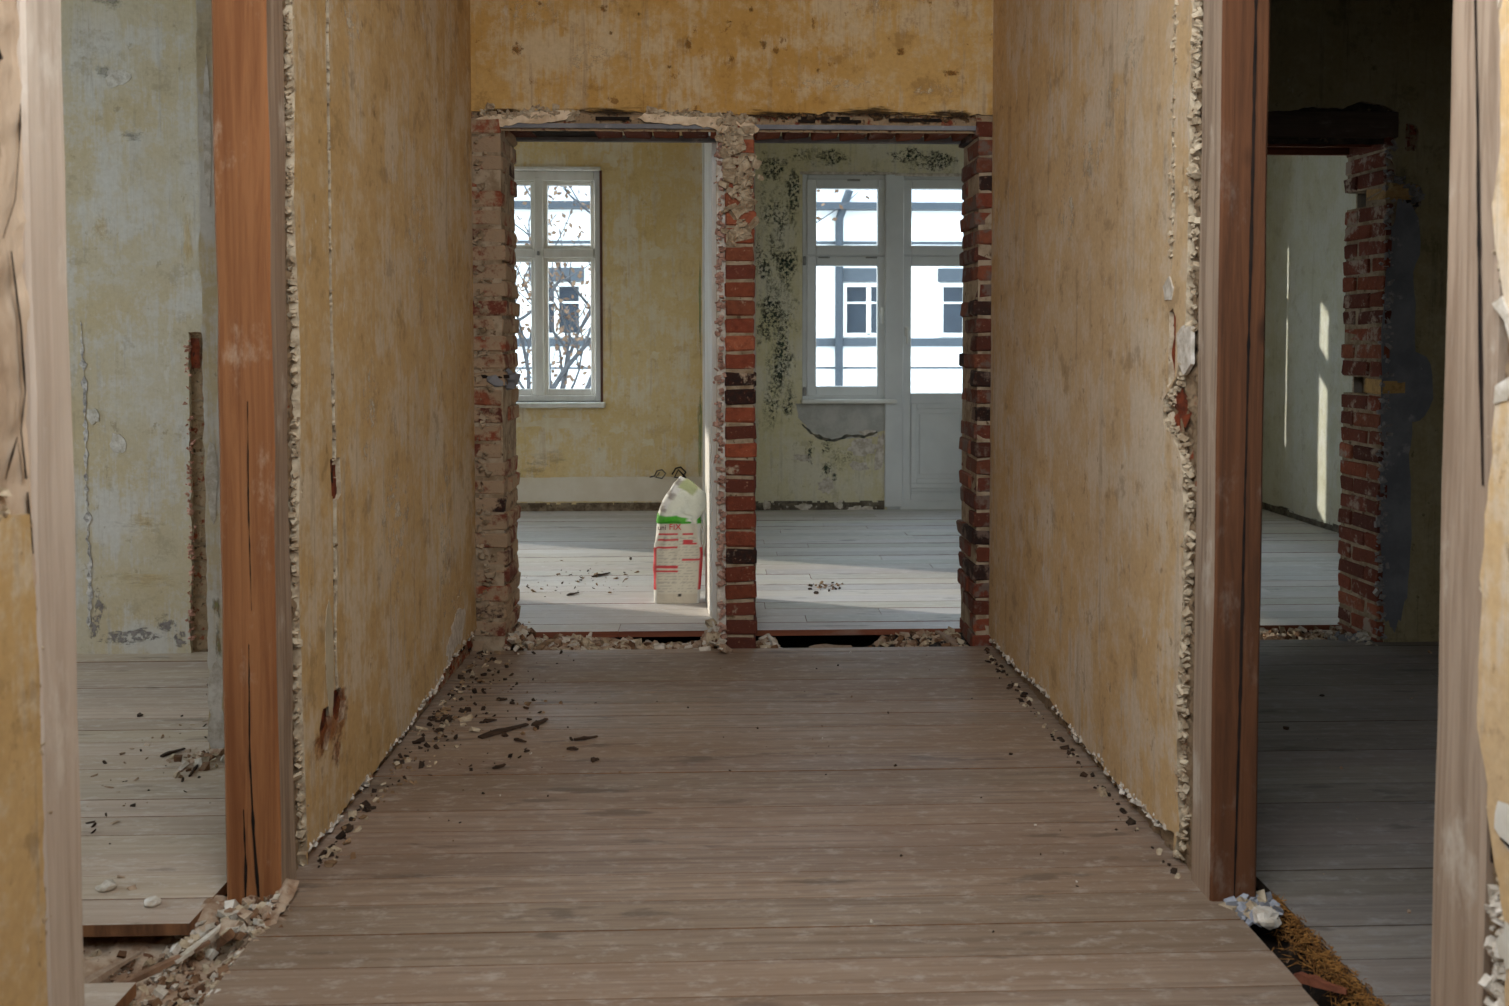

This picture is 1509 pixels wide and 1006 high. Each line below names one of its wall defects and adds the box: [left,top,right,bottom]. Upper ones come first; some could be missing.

leakage [892,148,958,171]
flaking render [0,0,36,588]
leakage [756,149,847,420]
flaking render [1492,250,1509,404]
flaking render [795,403,885,471]
flaking render [989,0,1204,872]
flaking render [1478,801,1509,1006]